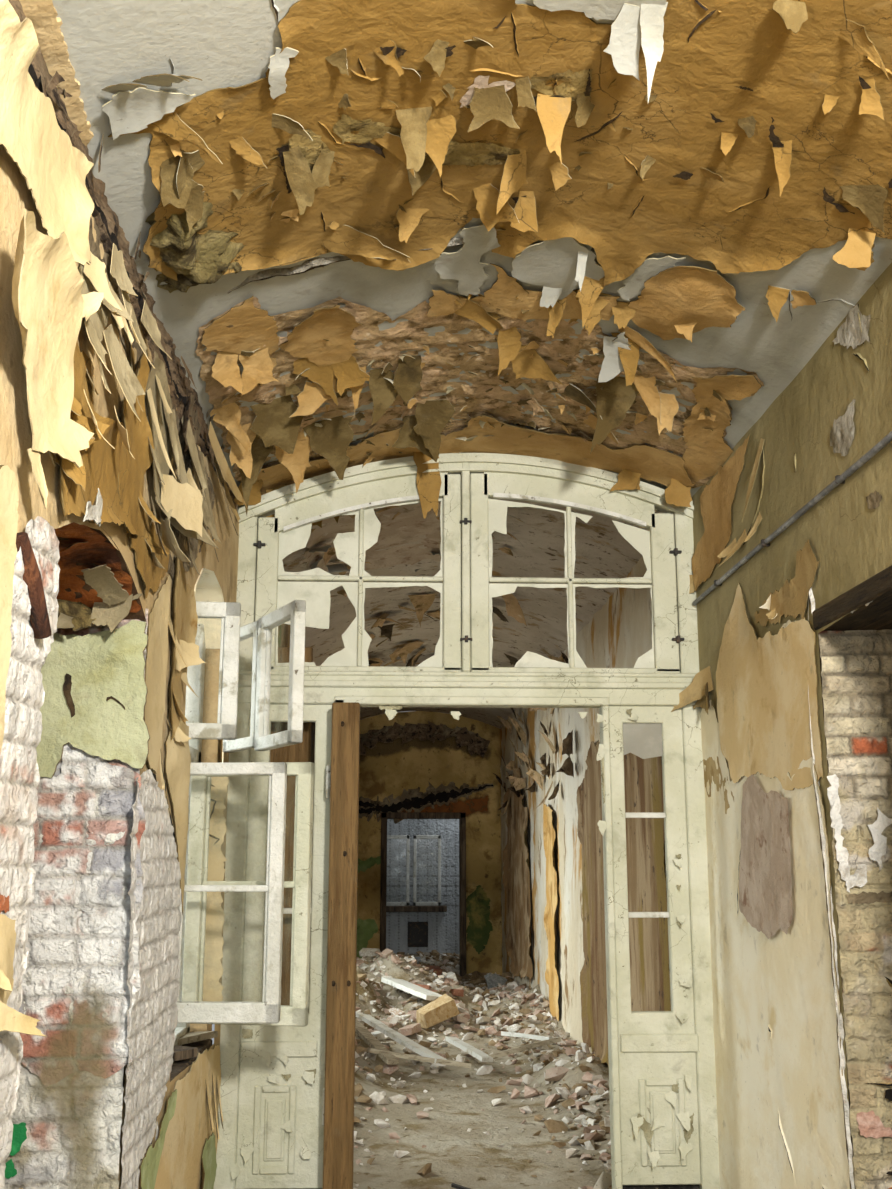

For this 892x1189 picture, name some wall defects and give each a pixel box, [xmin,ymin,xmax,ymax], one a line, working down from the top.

peeling [102,0,892,594]
spalling [0,0,248,1189]
peeling [357,918,393,968]
peeling [368,593,441,667]
peeling [360,706,490,757]
crack [359,781,494,824]
peeling [466,708,609,1070]
peeling [624,753,692,1024]
peeling [671,539,892,1189]
crack [807,588,815,621]
crack [808,689,892,1189]
crack [778,1110,794,1175]